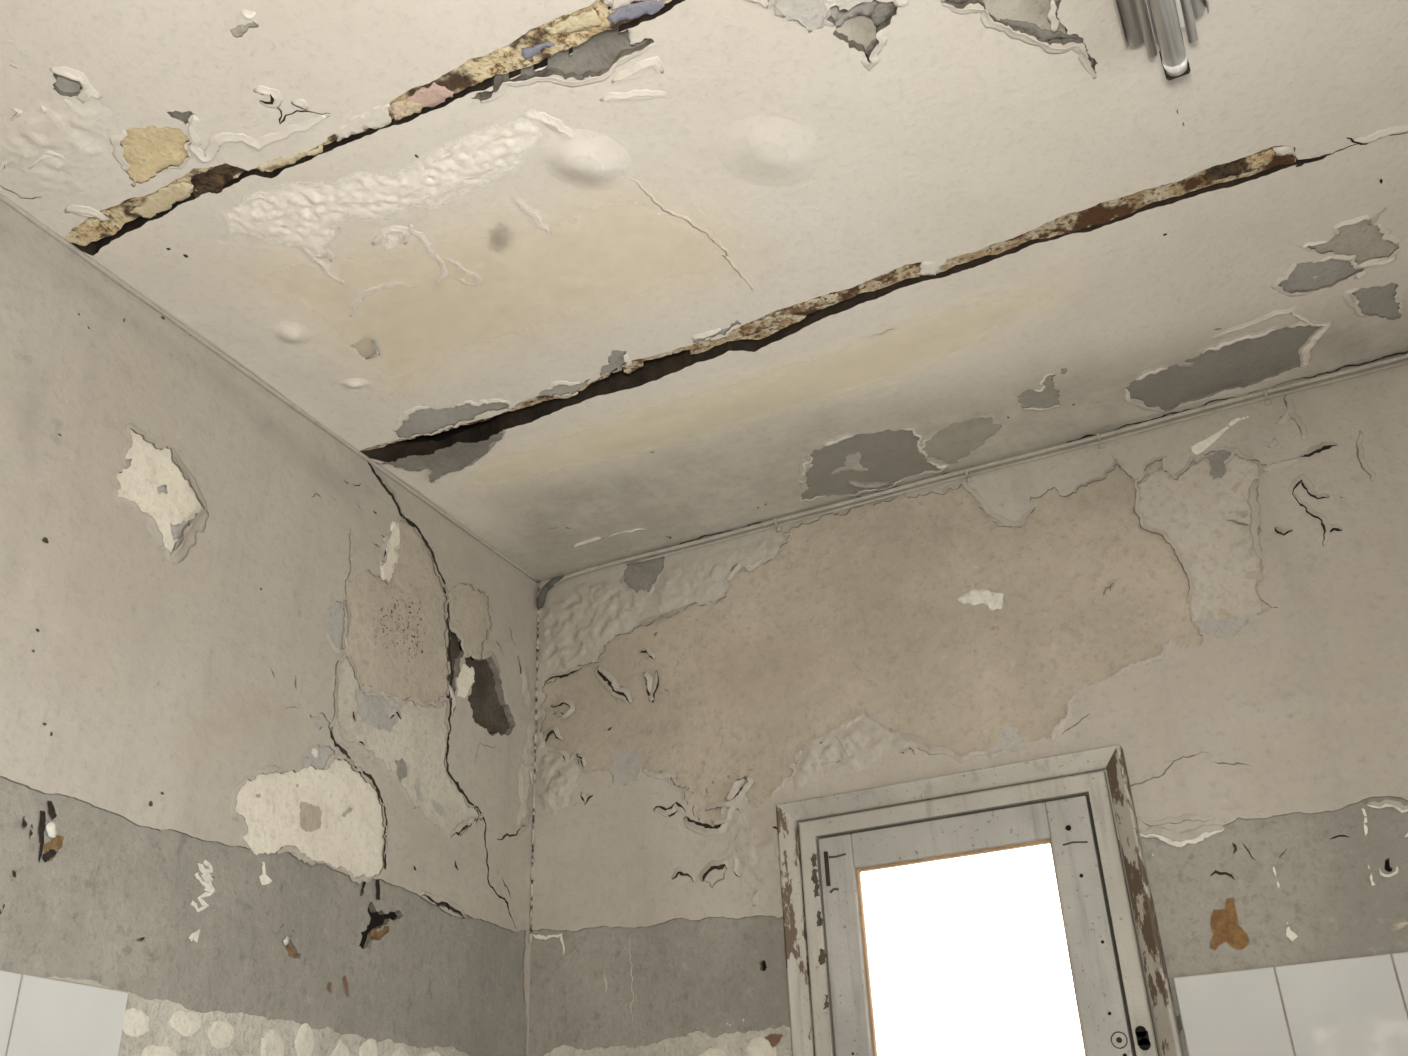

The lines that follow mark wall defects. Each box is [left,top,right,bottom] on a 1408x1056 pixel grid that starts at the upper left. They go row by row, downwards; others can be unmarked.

flaking render [752,0,896,71]
crack [894,0,910,8]
crack [188,85,330,163]
crack [630,178,753,290]
peeling [1271,207,1405,318]
peeling [1122,321,1334,413]
crack [1211,306,1312,339]
peeling [112,423,209,565]
peeling [536,368,1271,827]
peeling [230,517,510,858]
crack [312,462,535,929]
rust [1210,898,1249,950]